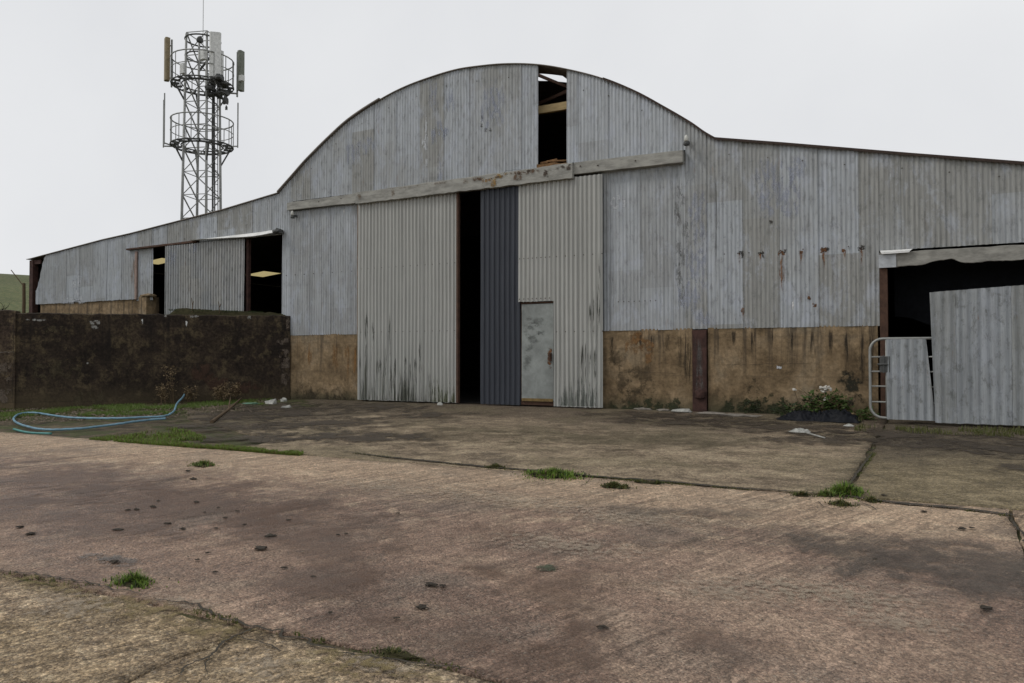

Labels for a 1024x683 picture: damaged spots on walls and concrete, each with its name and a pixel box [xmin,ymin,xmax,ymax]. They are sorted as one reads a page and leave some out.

leakage [297,315,432,402]
crack [1,570,478,679]